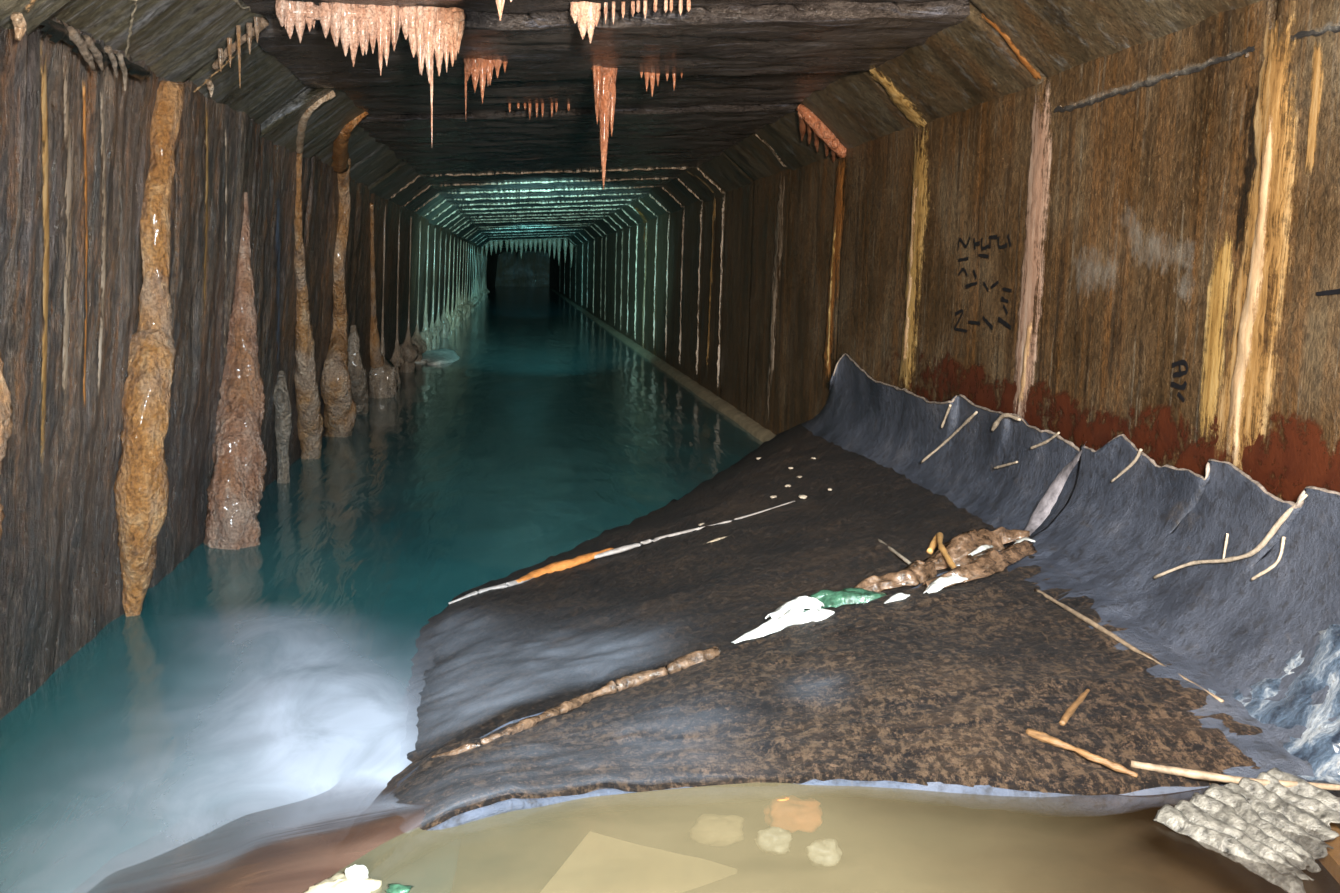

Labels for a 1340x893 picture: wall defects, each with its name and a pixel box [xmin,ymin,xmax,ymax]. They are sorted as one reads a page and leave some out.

crack [1054,46,1255,113]
crack [1289,22,1340,42]
water stain [41,52,107,458]
corrosion [892,354,1340,503]